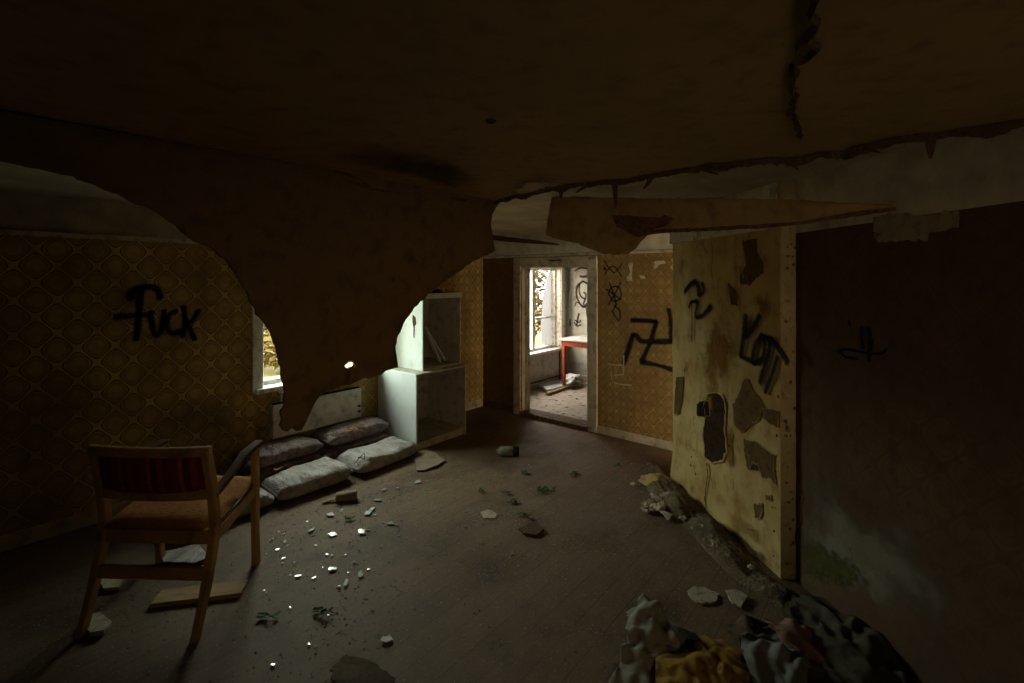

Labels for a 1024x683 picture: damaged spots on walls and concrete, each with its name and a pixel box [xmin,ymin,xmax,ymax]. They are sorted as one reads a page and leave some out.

crack [786,0,823,140]
spalling [636,207,896,307]
peeling [674,376,683,415]
spalling [693,378,797,519]
leakage [812,500,937,602]